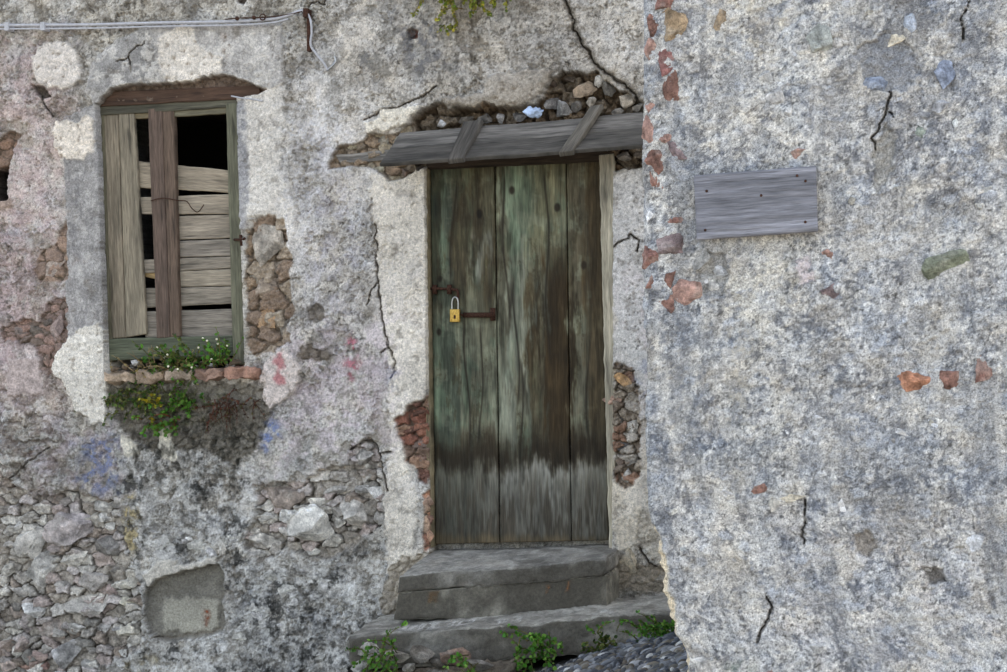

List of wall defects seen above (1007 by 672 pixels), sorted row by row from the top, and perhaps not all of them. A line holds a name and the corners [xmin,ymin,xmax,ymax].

spalling [330,0,688,189]
crack [564,0,644,110]
crack [870,89,893,149]
flaking render [2,299,69,376]
flaking render [246,215,294,356]
crack [366,224,396,379]
flaking render [602,363,641,488]
flaking render [0,472,143,672]
flaking render [245,438,385,561]
flaking render [379,399,435,615]
crack [757,596,773,643]
crack [800,501,808,542]